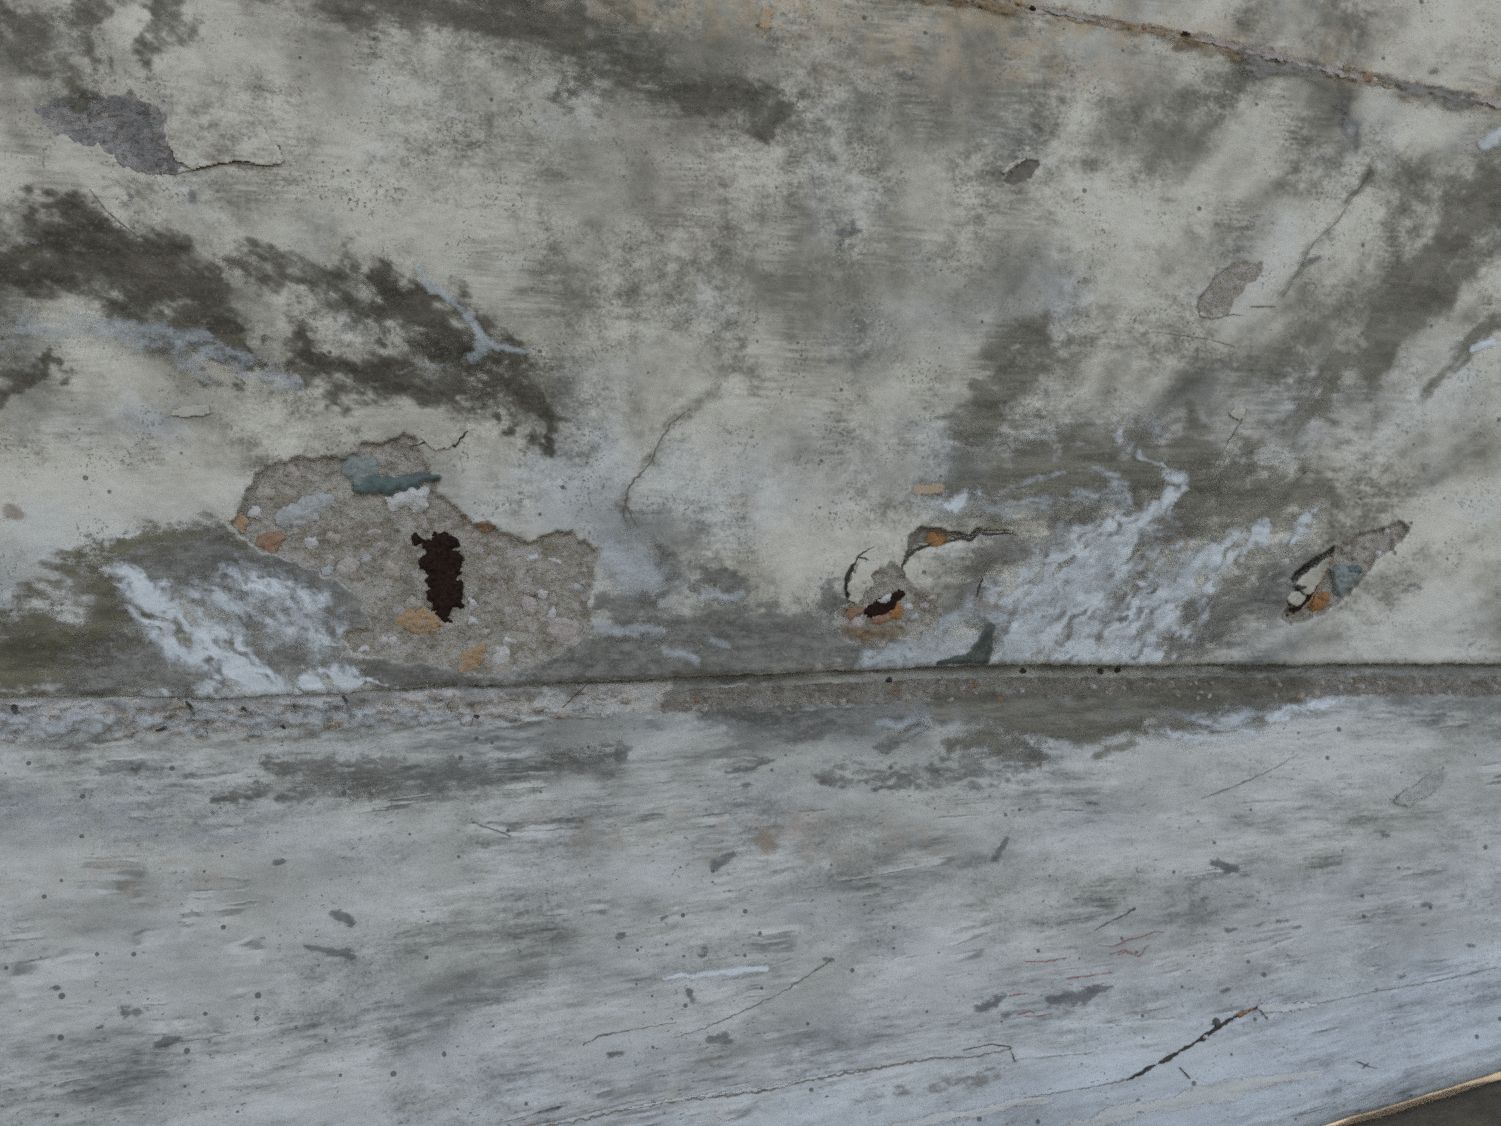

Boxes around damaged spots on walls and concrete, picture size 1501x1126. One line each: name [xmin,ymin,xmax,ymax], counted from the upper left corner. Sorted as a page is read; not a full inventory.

damp [0,1,89,112]
damp [71,0,119,68]
spalling [33,89,187,177]
damp [134,0,196,80]
damp [318,0,793,145]
crack [923,0,1501,110]
damp [0,186,565,457]
damp [521,127,1501,684]
damp [0,514,495,699]
spalling [0,430,1501,743]
crack [547,1044,1015,1126]
crack [1024,967,1496,1099]